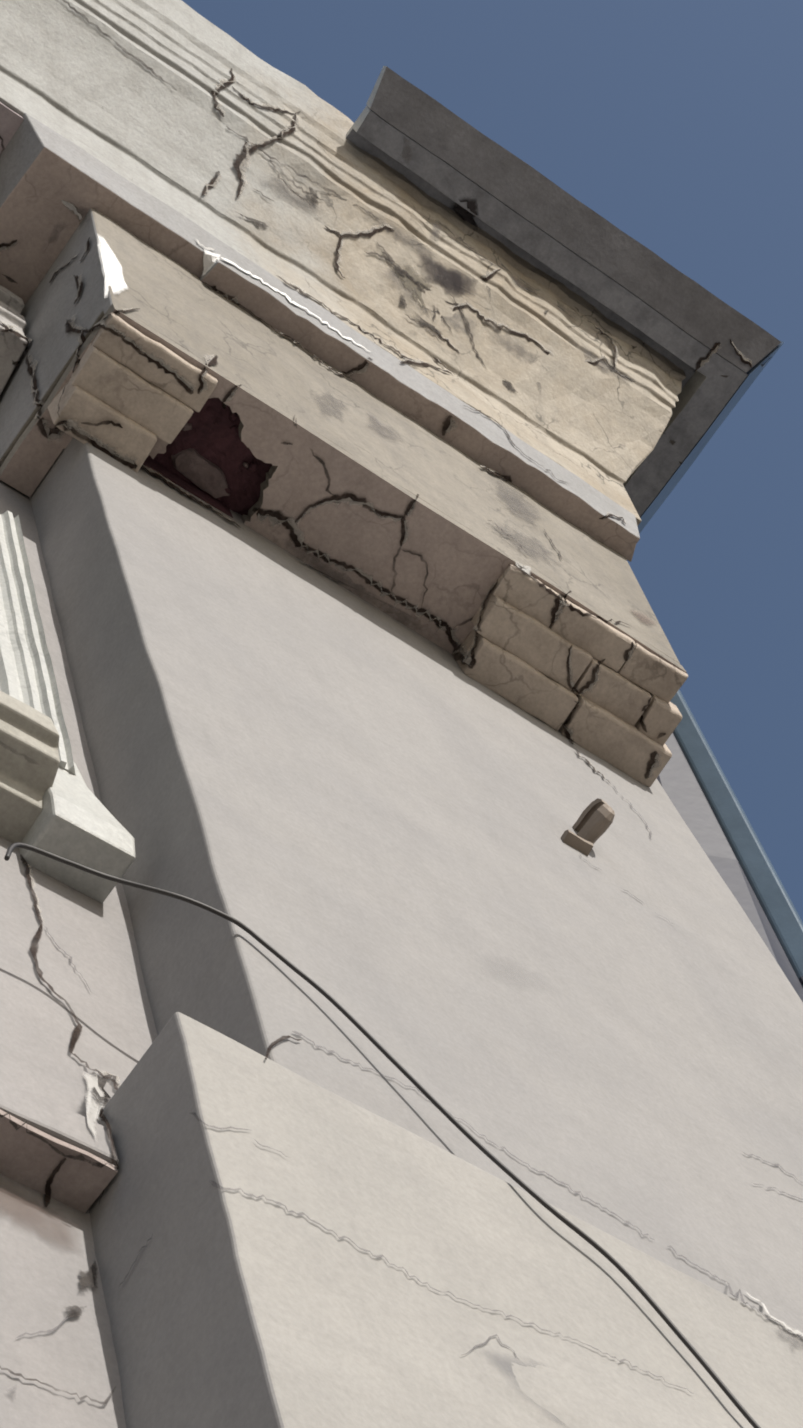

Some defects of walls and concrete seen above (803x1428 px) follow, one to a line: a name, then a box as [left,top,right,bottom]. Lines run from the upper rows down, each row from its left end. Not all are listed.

crack [63,0,164,81]
crack [202,68,636,484]
flaking render [148,398,272,515]
crack [0,237,652,837]
crack [20,854,120,1169]
crack [44,1158,66,1208]